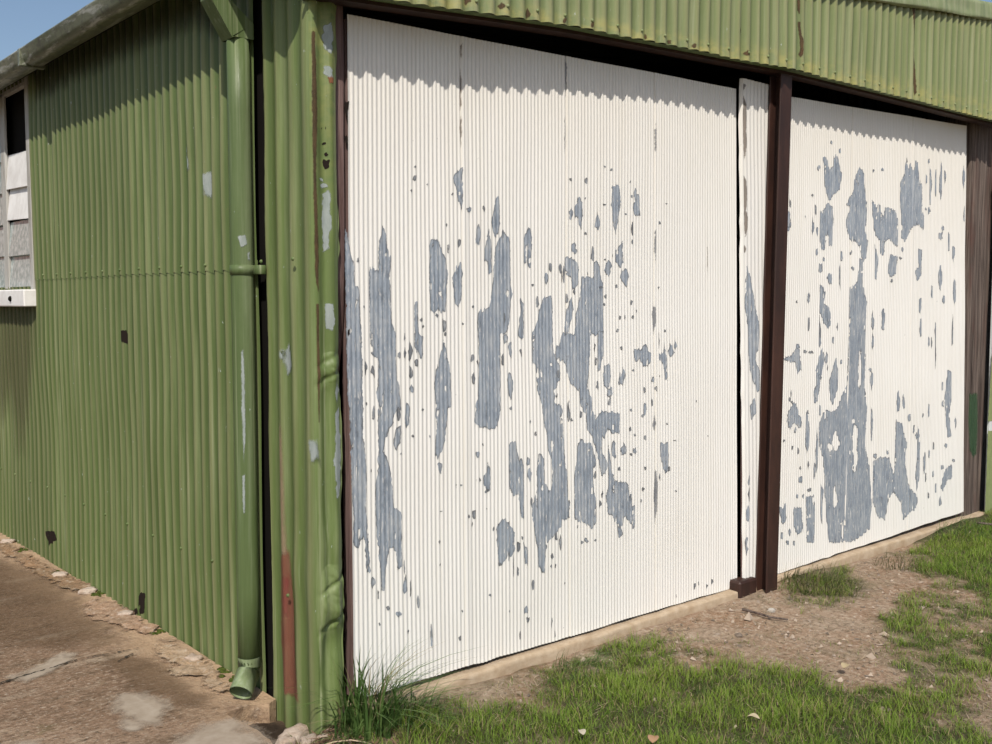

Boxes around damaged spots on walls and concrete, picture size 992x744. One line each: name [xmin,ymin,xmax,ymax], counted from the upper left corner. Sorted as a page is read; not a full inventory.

peeling [322,22,334,53]
peeling [320,178,332,251]
peeling [451,167,471,212]
peeling [325,225,424,617]
peeling [429,239,463,474]
peeling [471,180,677,590]
peeling [745,267,760,420]
peeling [780,140,957,546]
rust [279,426,297,699]